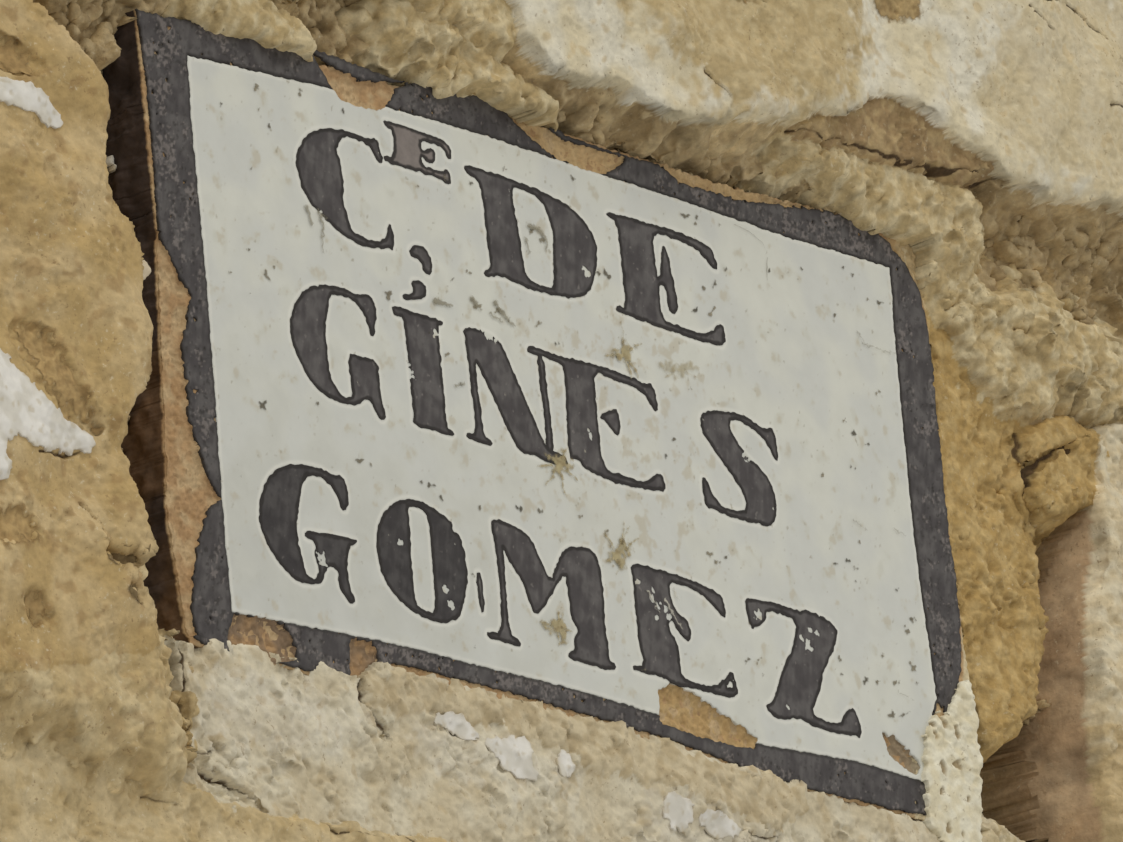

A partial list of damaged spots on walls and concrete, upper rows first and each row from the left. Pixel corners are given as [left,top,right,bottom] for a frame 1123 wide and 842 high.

peeling [319,65,399,113]
peeling [349,638,377,676]
peeling [658,683,758,749]
peeling [882,732,920,775]